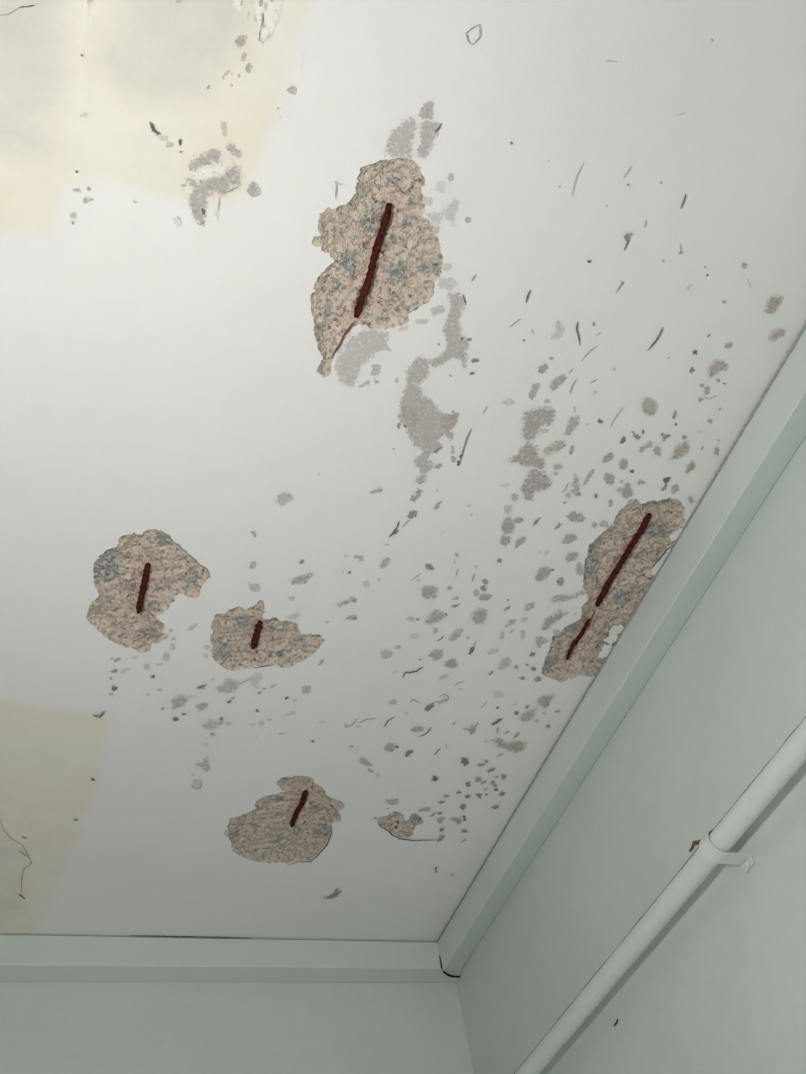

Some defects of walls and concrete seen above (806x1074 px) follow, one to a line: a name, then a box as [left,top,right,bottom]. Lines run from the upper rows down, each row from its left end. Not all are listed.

peeling [69,186,94,225]
water stain [0,0,316,245]
peeling [149,120,261,227]
spalling [310,100,480,588]
spalling [86,529,330,789]
peeling [275,490,294,506]
peeling [336,596,357,620]
peeling [344,553,492,737]
spalling [373,320,732,843]
water stain [0,693,120,934]
spalling [224,776,345,866]